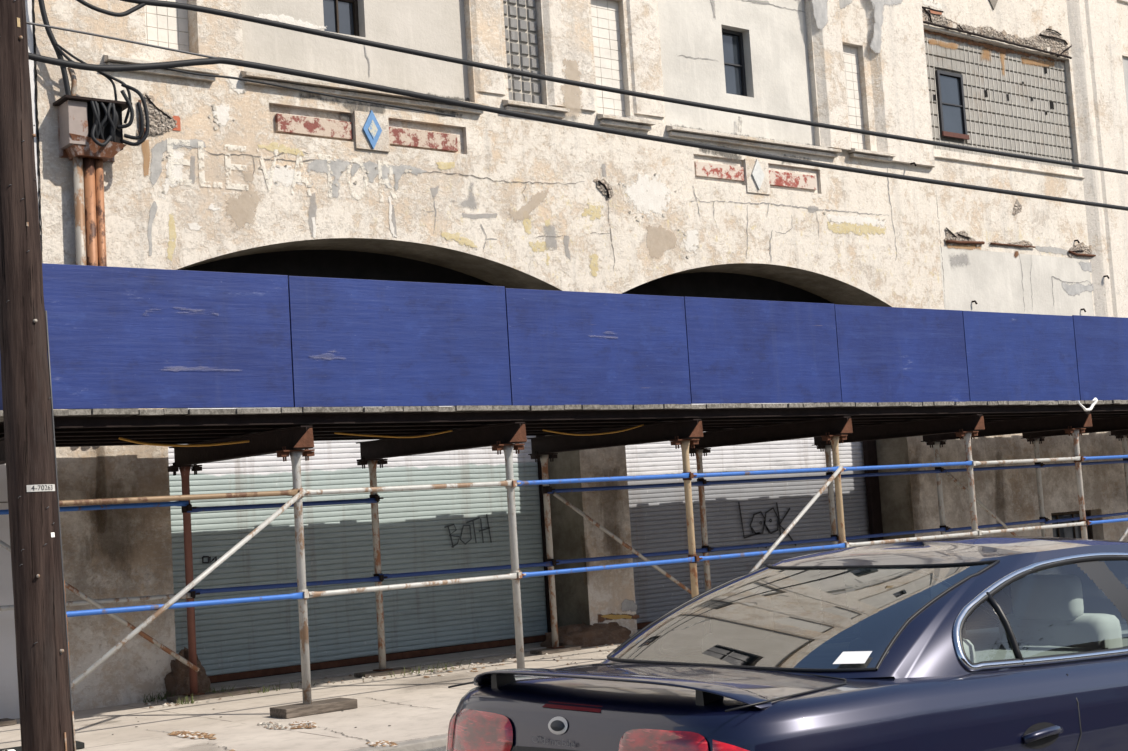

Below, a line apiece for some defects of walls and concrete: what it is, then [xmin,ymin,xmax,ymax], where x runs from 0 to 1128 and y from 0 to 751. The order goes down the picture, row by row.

rust [929,39,958,49]
spalling [922,0,1072,62]
peeling [209,142,455,231]
peeling [582,164,700,259]
peeling [441,232,478,248]
peeling [509,190,550,265]
peeling [589,253,599,277]
spalling [945,227,1036,257]
spalling [1068,242,1096,258]